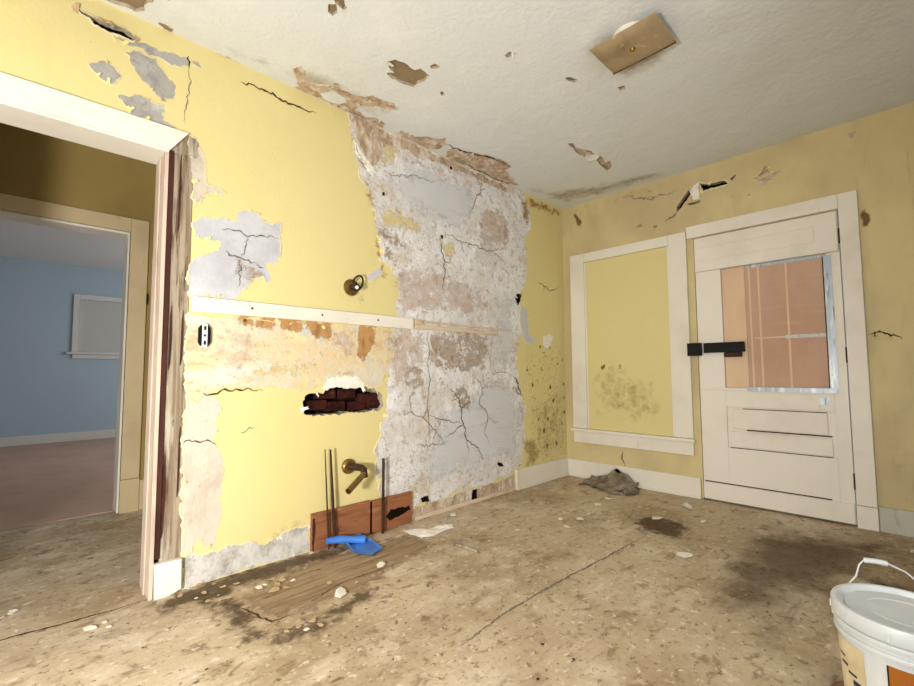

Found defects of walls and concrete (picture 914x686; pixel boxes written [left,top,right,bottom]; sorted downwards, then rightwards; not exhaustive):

flaking render [107,0,153,12]
flaking render [328,0,347,16]
flaking render [386,59,440,87]
peeling [70,2,227,206]
crack [184,56,192,122]
crack [242,82,316,113]
flaking render [568,143,612,171]
crack [628,191,677,221]
peeling [179,66,553,589]
crack [404,334,524,460]